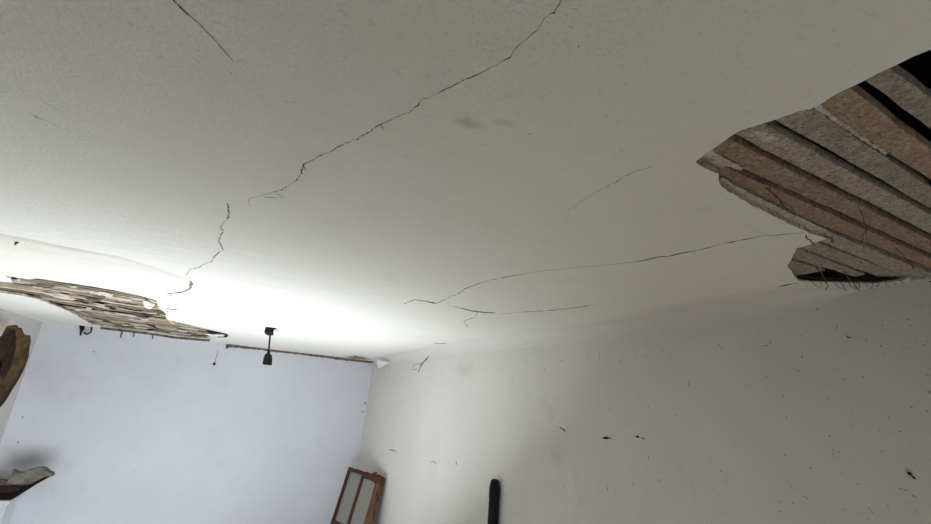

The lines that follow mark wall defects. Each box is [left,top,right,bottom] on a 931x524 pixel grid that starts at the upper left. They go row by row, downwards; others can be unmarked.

crack [173,0,234,62]
crack [186,0,561,275]
spalling [701,65,931,291]
spalling [0,276,229,342]
crack [404,233,792,327]